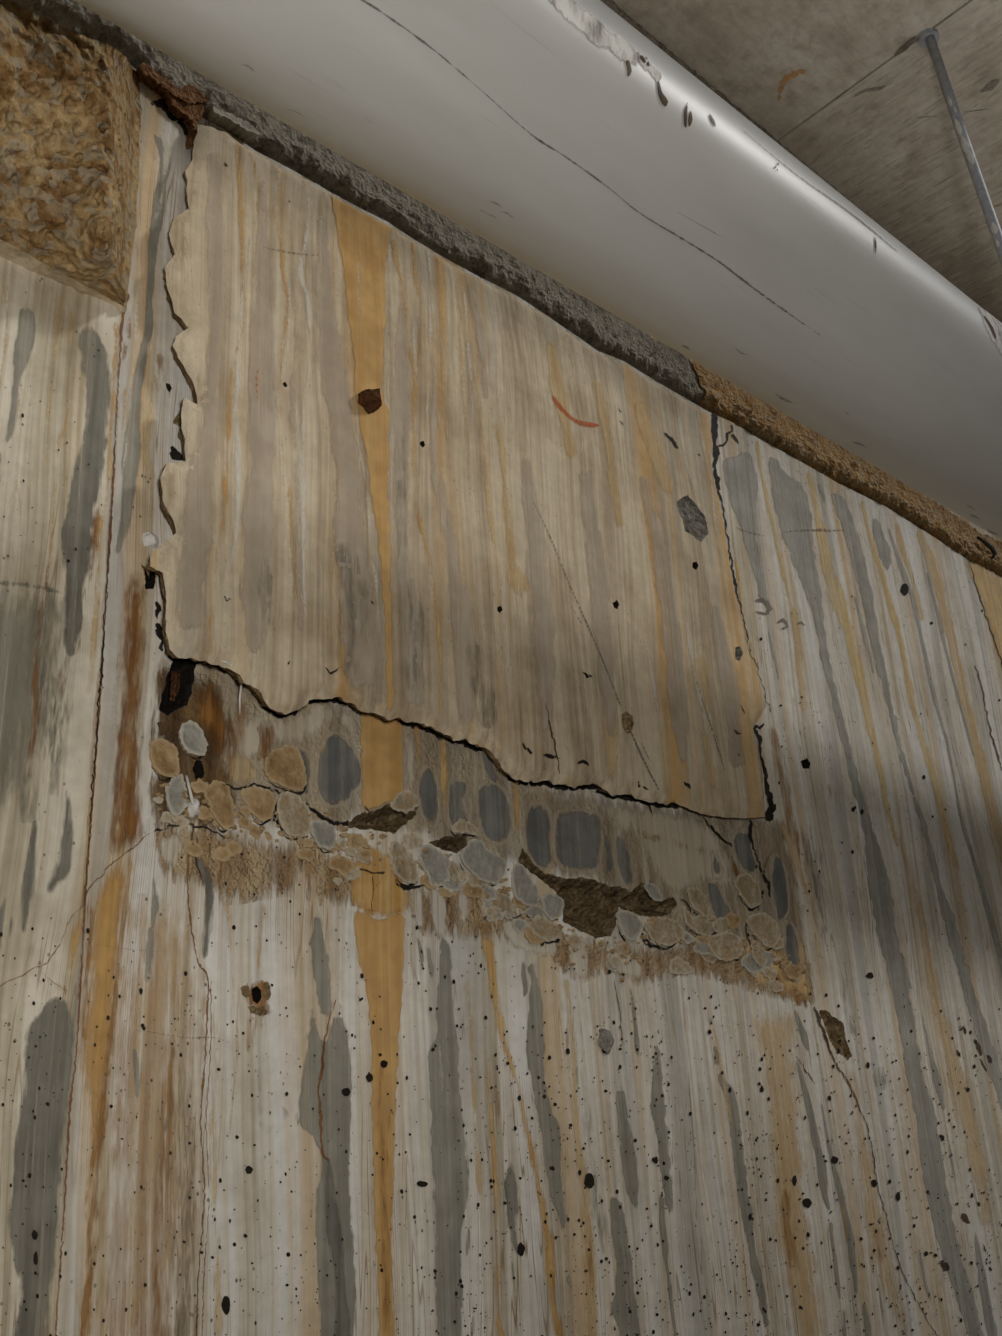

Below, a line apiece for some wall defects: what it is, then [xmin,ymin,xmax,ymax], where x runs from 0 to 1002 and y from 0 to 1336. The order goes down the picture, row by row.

rust [136,62,208,150]
spalling [0,0,1002,577]
leakage [0,330,111,811]
rust [331,196,478,809]
crack [155,413,776,951]
peeling [149,658,852,1061]
leakage [709,452,1002,1336]
leakage [10,999,73,1336]
leakage [299,918,356,1336]
rust [354,912,404,1336]
leakage [418,939,473,1336]
crack [814,1007,939,1336]